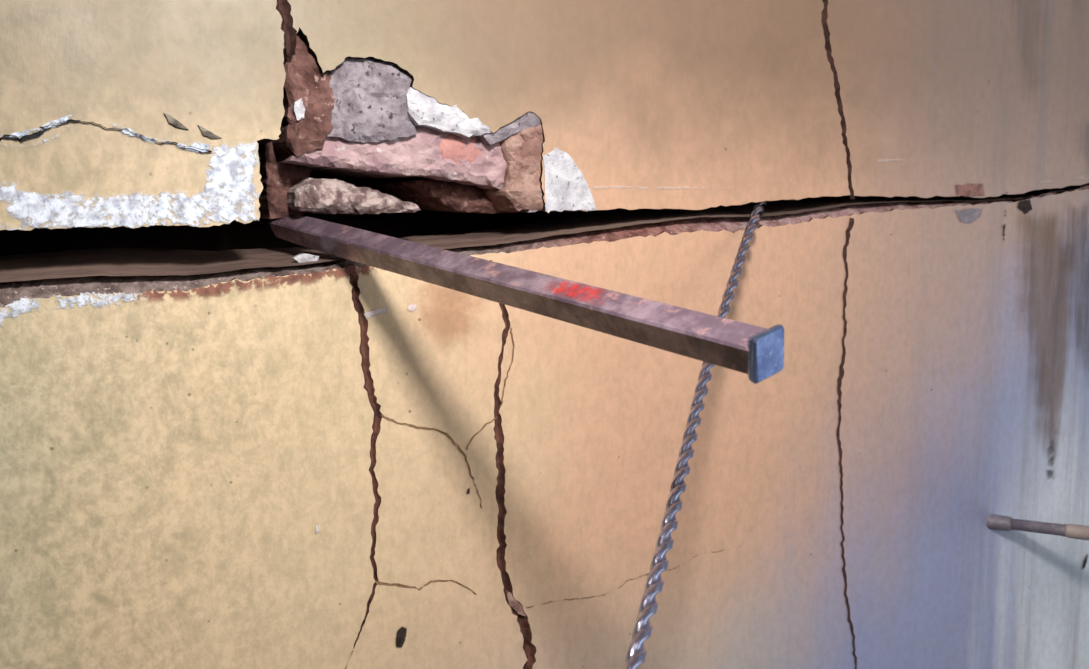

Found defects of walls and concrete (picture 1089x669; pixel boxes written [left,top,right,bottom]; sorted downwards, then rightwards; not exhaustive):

crack [276,0,297,55]
flaking render [0,32,596,230]
flaking render [0,298,39,322]
flaking render [56,292,139,308]
crack [399,0,1089,669]
damp [1031,220,1069,476]
crack [0,247,649,669]